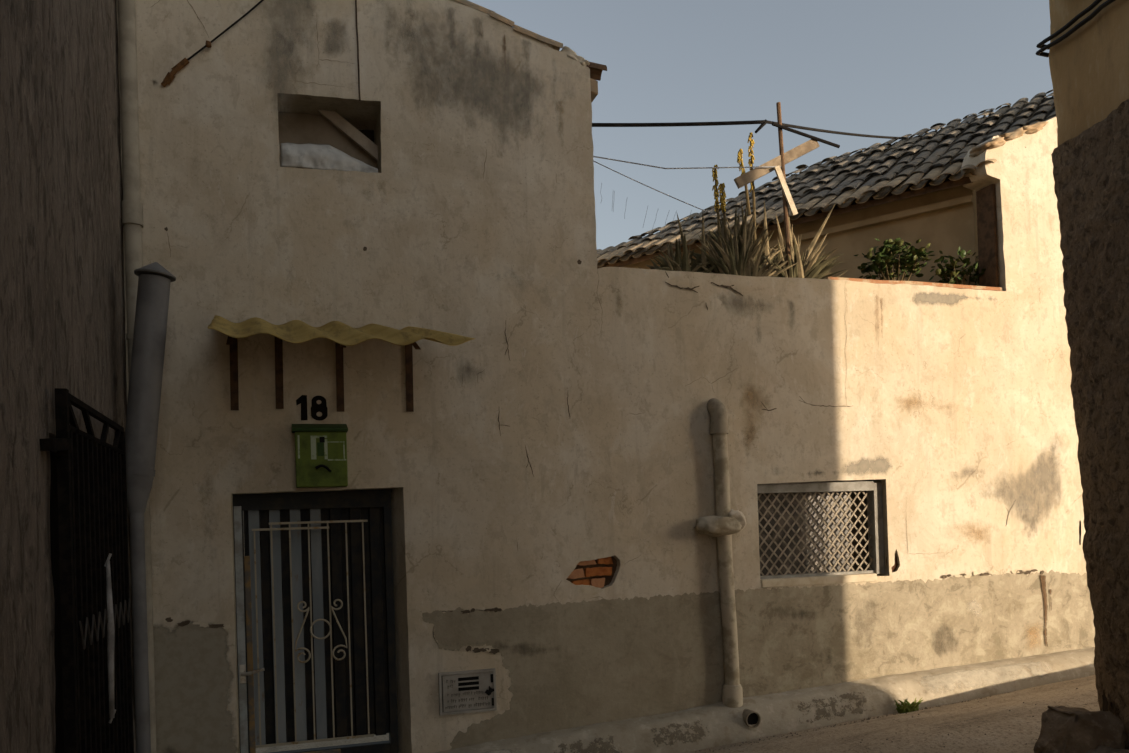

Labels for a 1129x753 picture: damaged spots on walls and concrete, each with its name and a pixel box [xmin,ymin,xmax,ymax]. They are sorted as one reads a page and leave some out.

damp [407,28,537,125]
crack [665,271,743,310]
damp [1000,448,1059,520]
flaking render [566,556,624,595]
spalling [798,691,873,723]
spalling [554,736,622,753]
spalling [651,720,709,747]